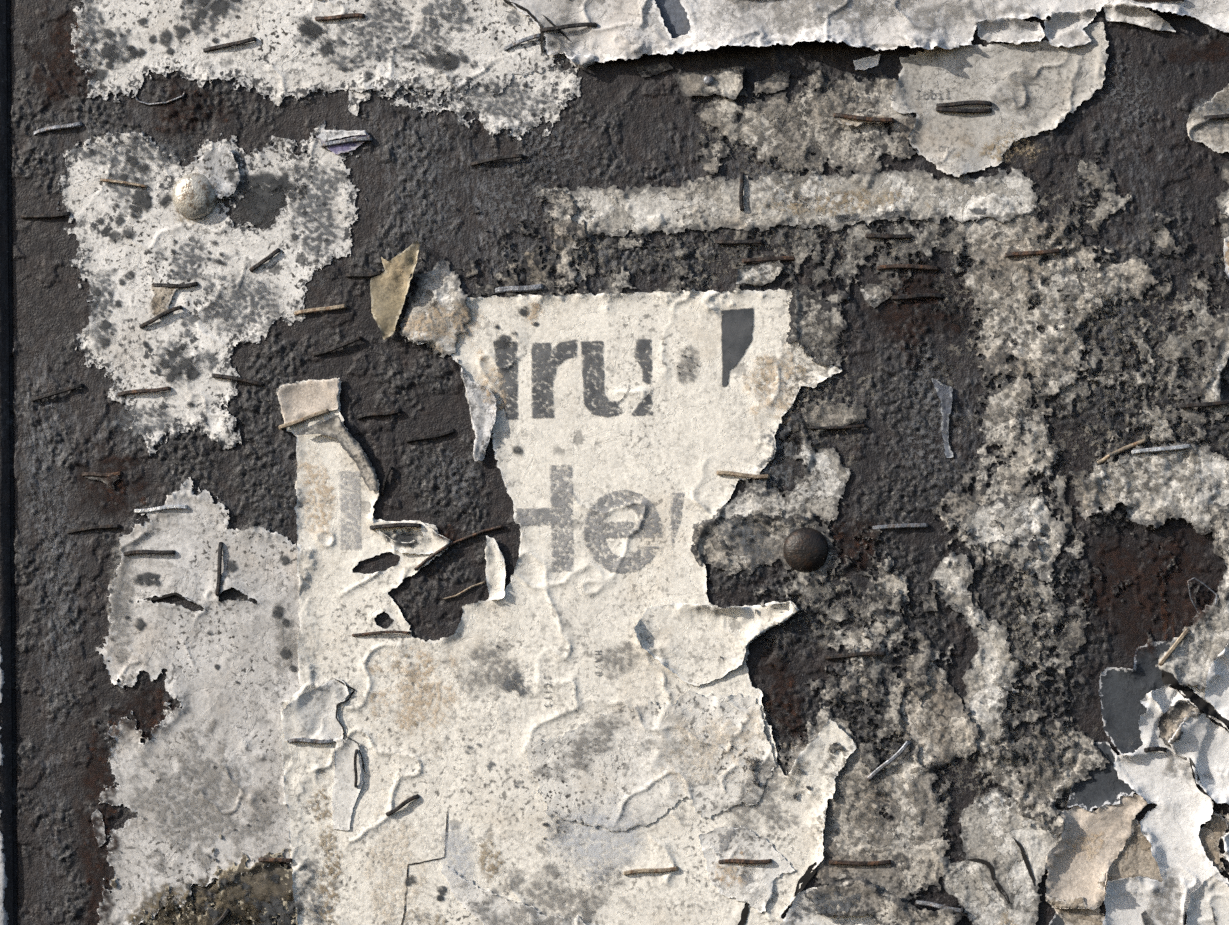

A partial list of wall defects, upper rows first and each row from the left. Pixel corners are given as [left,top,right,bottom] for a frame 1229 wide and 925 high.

damp [128,721,343,925]
damp [365,825,445,925]
crack [737,903,749,925]